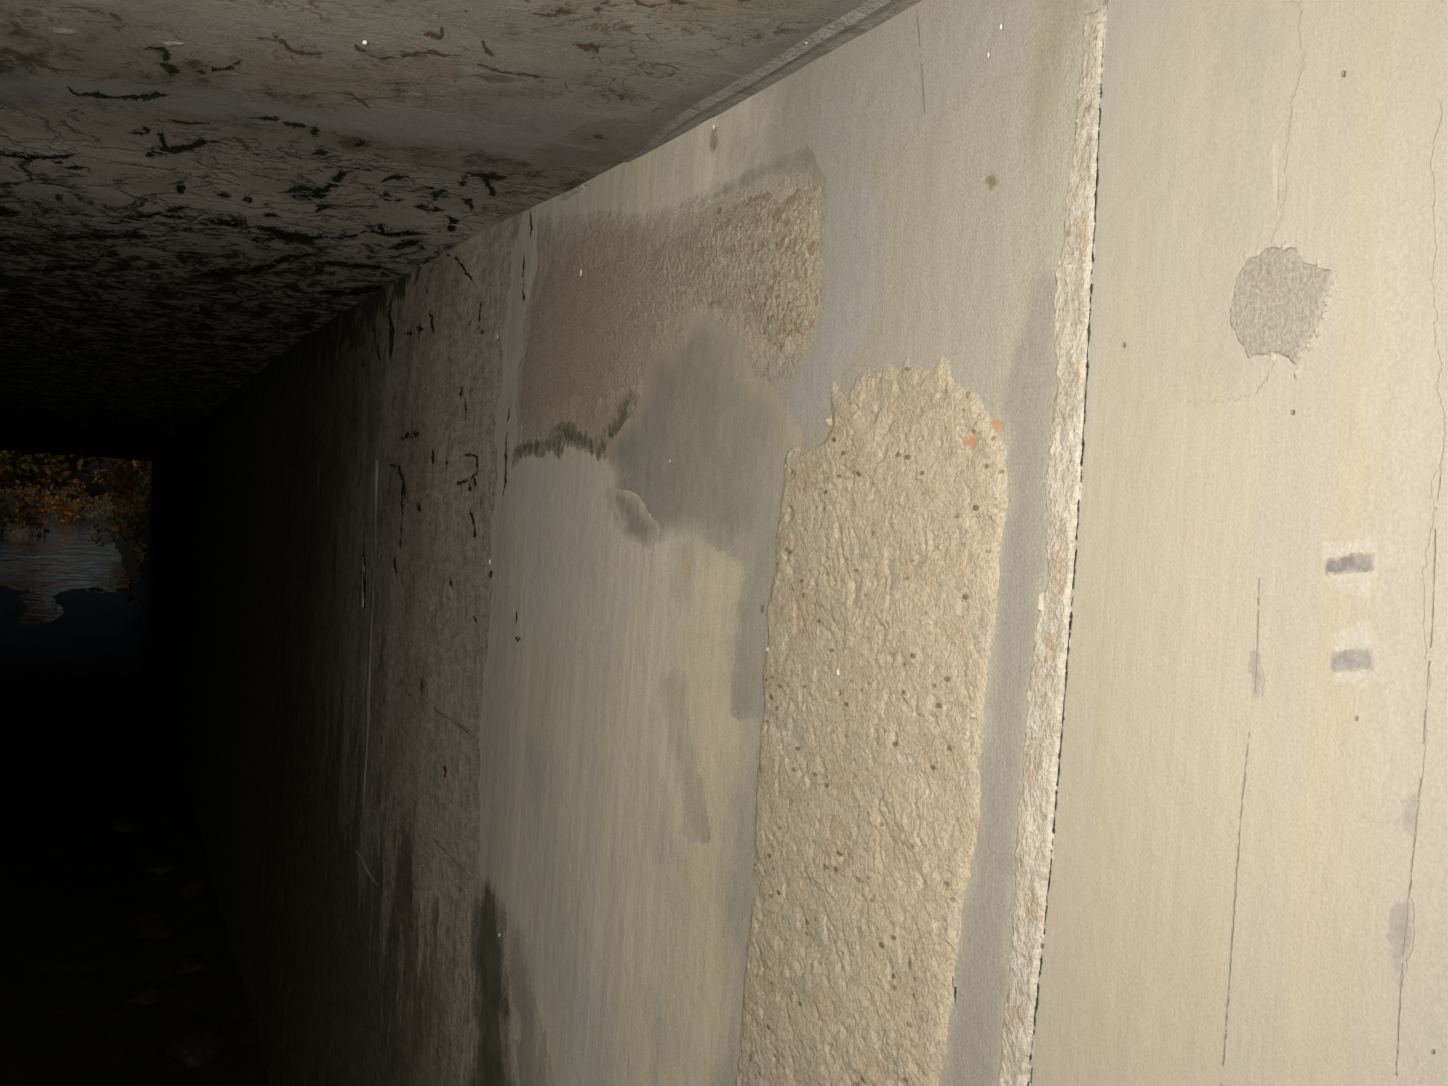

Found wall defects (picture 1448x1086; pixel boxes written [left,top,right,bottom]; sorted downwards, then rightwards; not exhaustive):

crack [0,46,508,298]
crack [276,7,540,78]
crack [522,214,533,301]
crack [525,0,690,52]
spalling [520,180,822,416]
crack [917,16,925,114]
leakage [512,145,827,1086]
spalling [734,355,1008,1086]
spalling [998,4,1108,1086]